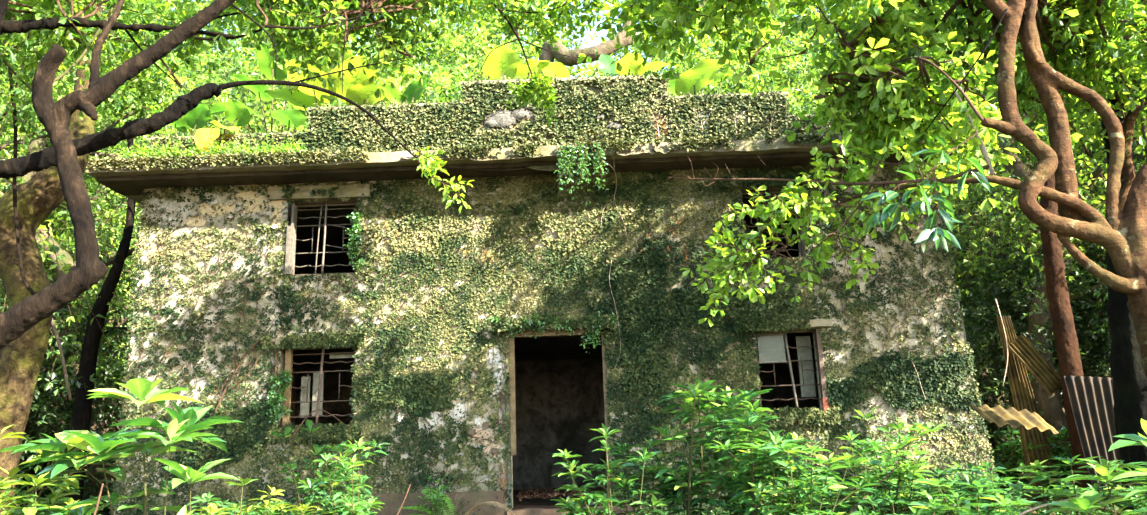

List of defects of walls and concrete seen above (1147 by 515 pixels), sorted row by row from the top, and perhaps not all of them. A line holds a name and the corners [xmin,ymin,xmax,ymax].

peeling [487,349,506,393]
spalling [421,402,501,458]